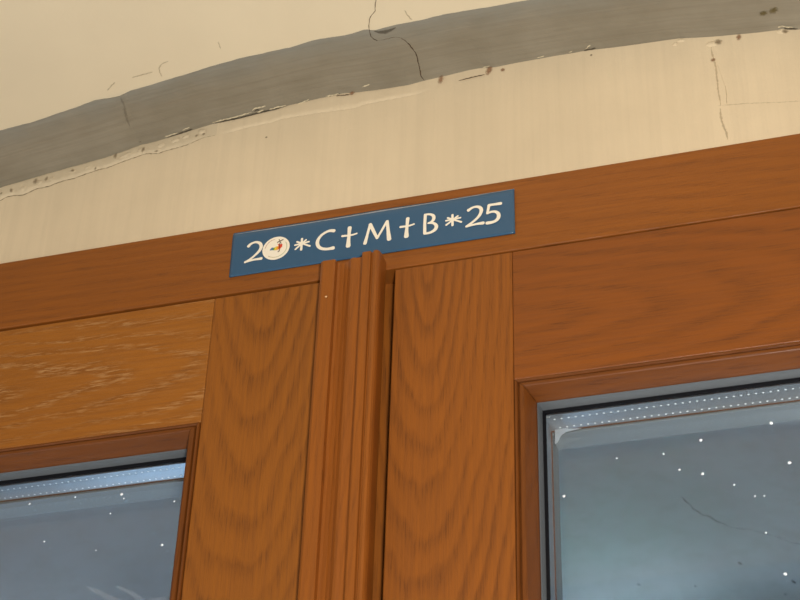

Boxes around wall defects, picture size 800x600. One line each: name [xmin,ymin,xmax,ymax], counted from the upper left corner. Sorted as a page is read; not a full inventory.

crack [369,1,424,80]
peeling [0,105,286,201]